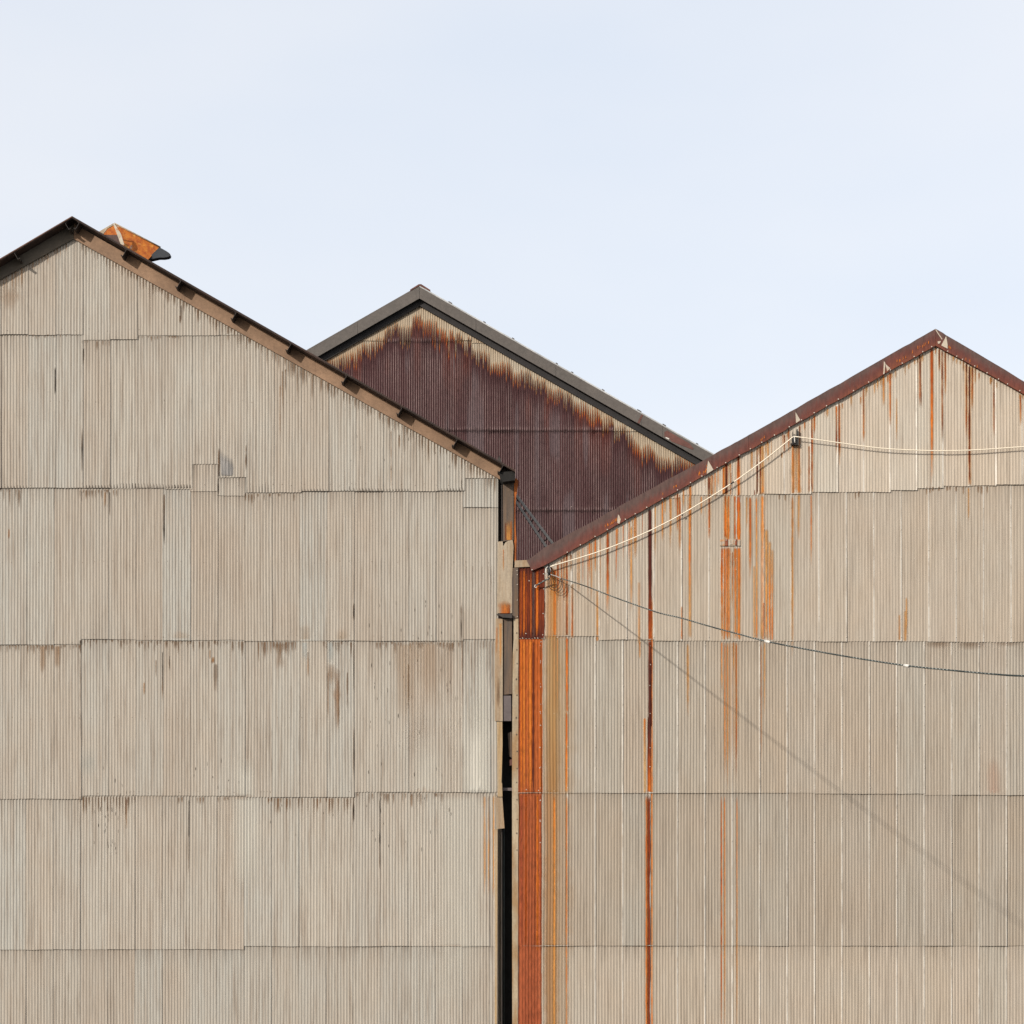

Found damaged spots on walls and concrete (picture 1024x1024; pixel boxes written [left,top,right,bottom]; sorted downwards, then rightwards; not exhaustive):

corrosion [327,315,997,1024]